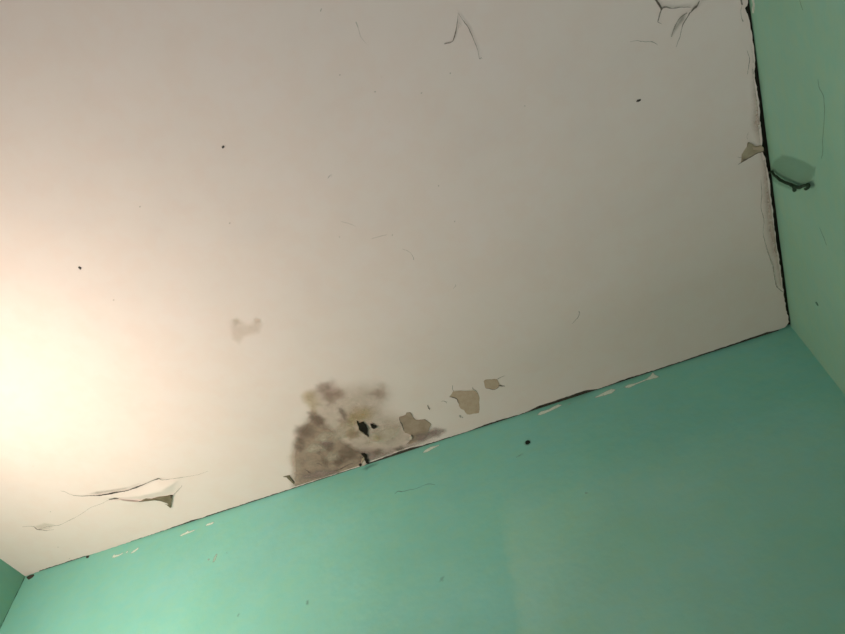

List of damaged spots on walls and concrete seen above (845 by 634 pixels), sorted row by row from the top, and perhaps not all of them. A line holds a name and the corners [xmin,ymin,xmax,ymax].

crack [133,0,790,541]
leakage [295,411,388,486]
peeling [399,412,431,444]
peeling [449,377,502,415]
crack [0,556,85,628]